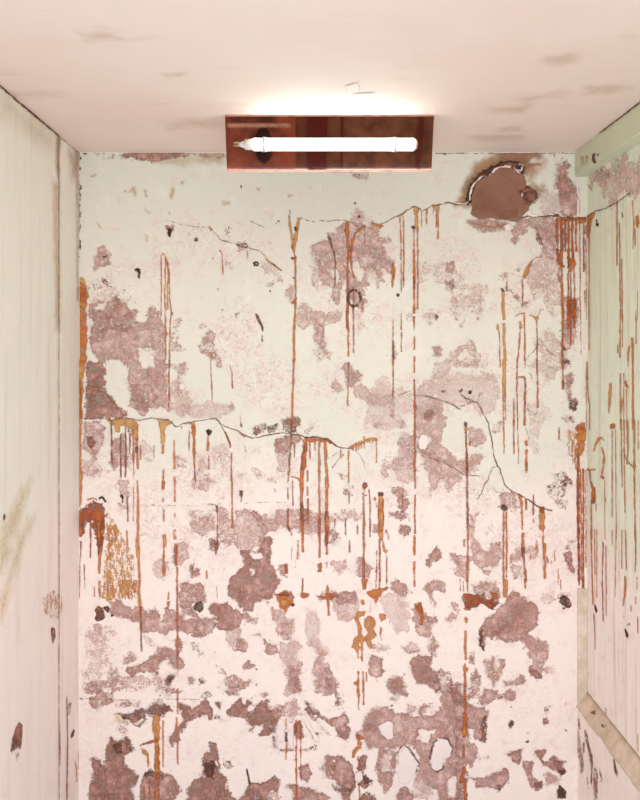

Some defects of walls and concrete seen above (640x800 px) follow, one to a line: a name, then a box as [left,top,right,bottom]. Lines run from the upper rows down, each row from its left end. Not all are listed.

rust [79,277,142,651]
peeling [81,245,233,478]
crack [80,387,364,462]
peeling [82,490,574,800]
rust [284,216,383,574]
rust [352,482,389,661]
peeling [331,340,506,542]
crack [379,201,466,225]
crack [399,392,552,511]
peeling [465,153,640,423]
crack [515,190,633,222]
rust [555,203,639,635]